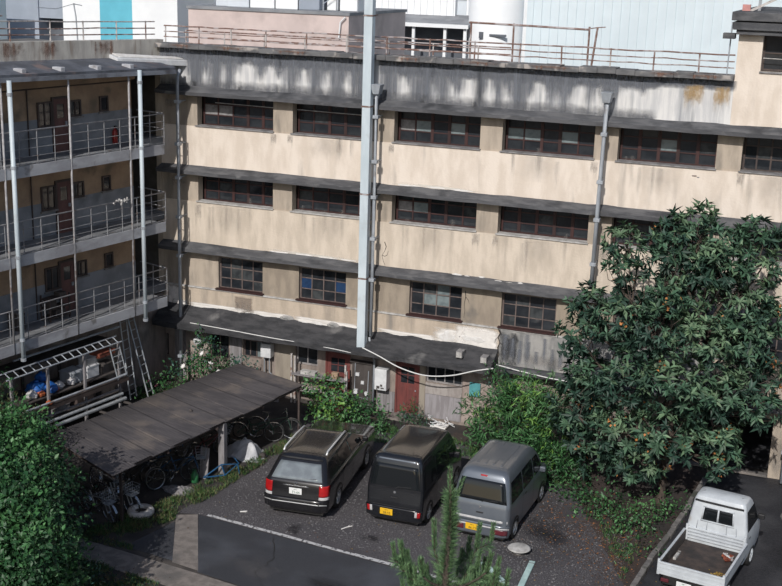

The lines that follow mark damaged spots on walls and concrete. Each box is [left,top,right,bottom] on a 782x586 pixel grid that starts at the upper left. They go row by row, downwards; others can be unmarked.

damp [159,47,363,99]
damp [380,60,733,119]
spalling [378,326,498,349]
crack [494,329,506,361]